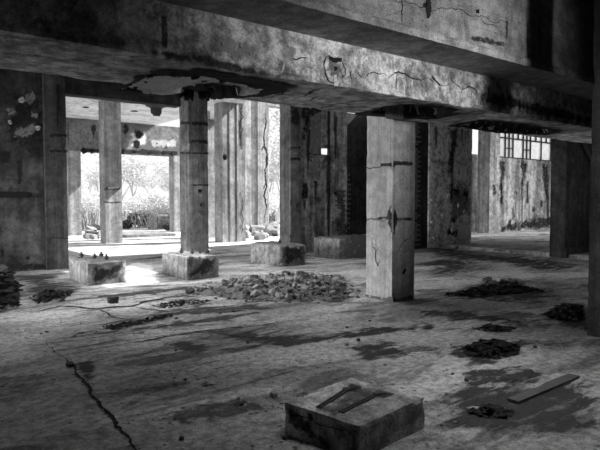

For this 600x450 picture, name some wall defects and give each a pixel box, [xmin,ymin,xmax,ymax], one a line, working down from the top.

crack [388,0,509,27]
spalling [101,68,297,101]
spalling [324,55,346,84]
spalling [447,119,563,136]
crack [260,117,268,223]
water stain [448,128,463,198]
water stain [501,160,550,232]
crack [46,319,299,450]
water stain [441,339,598,437]